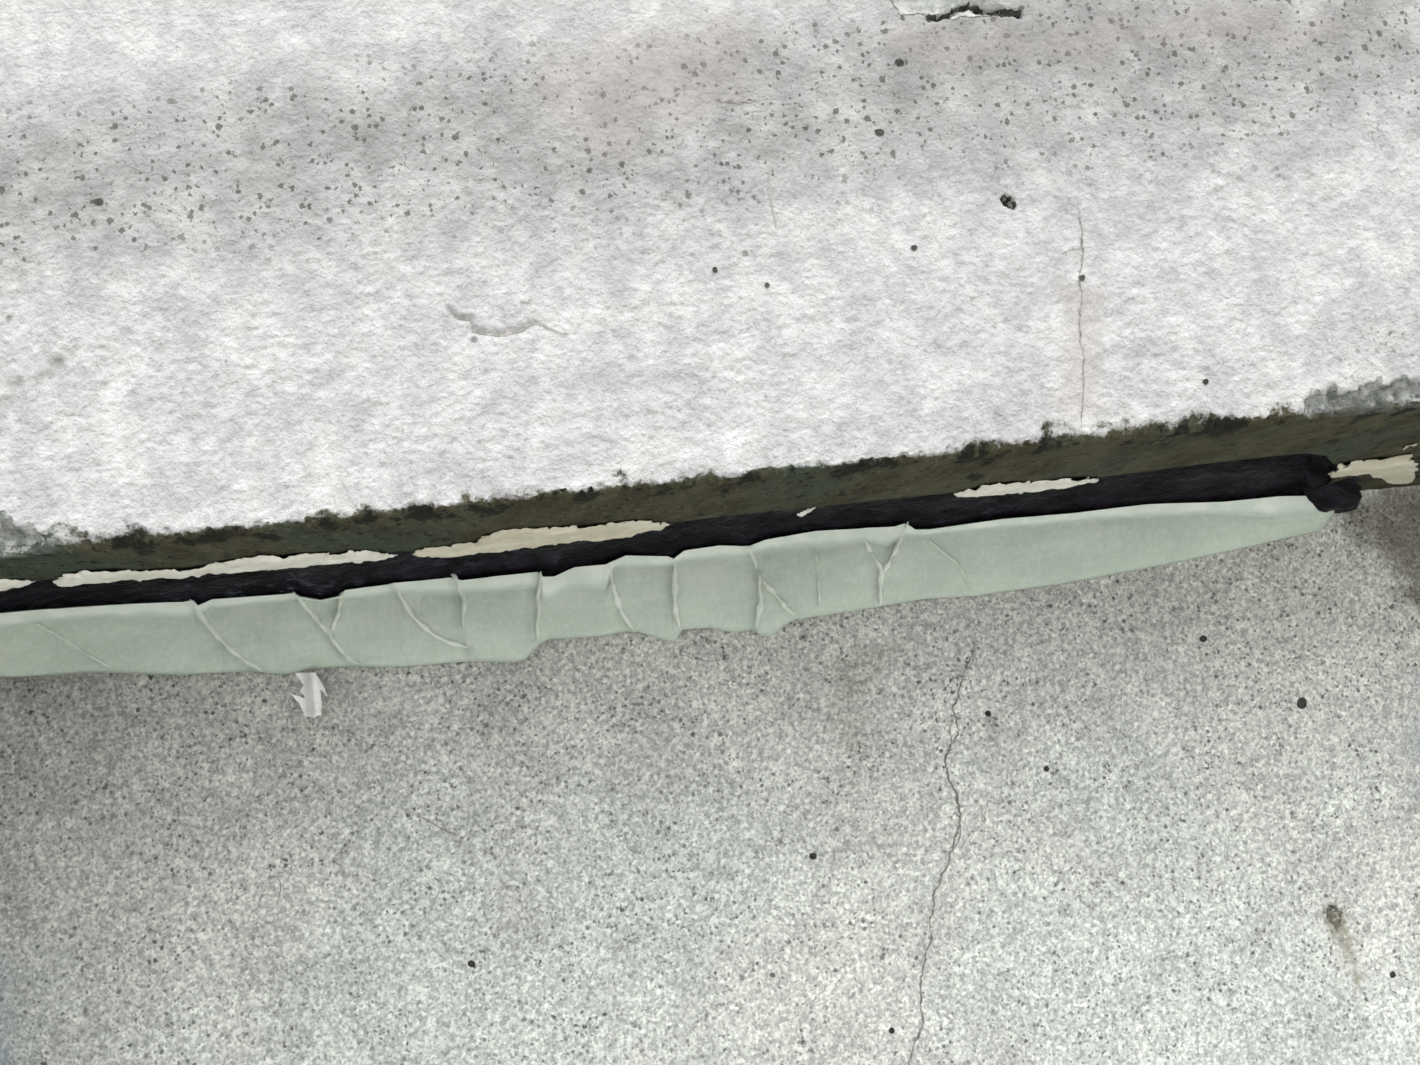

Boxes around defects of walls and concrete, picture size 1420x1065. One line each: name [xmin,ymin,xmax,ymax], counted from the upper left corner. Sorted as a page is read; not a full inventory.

spalling [0,509,60,555]
crack [908,626,976,1065]